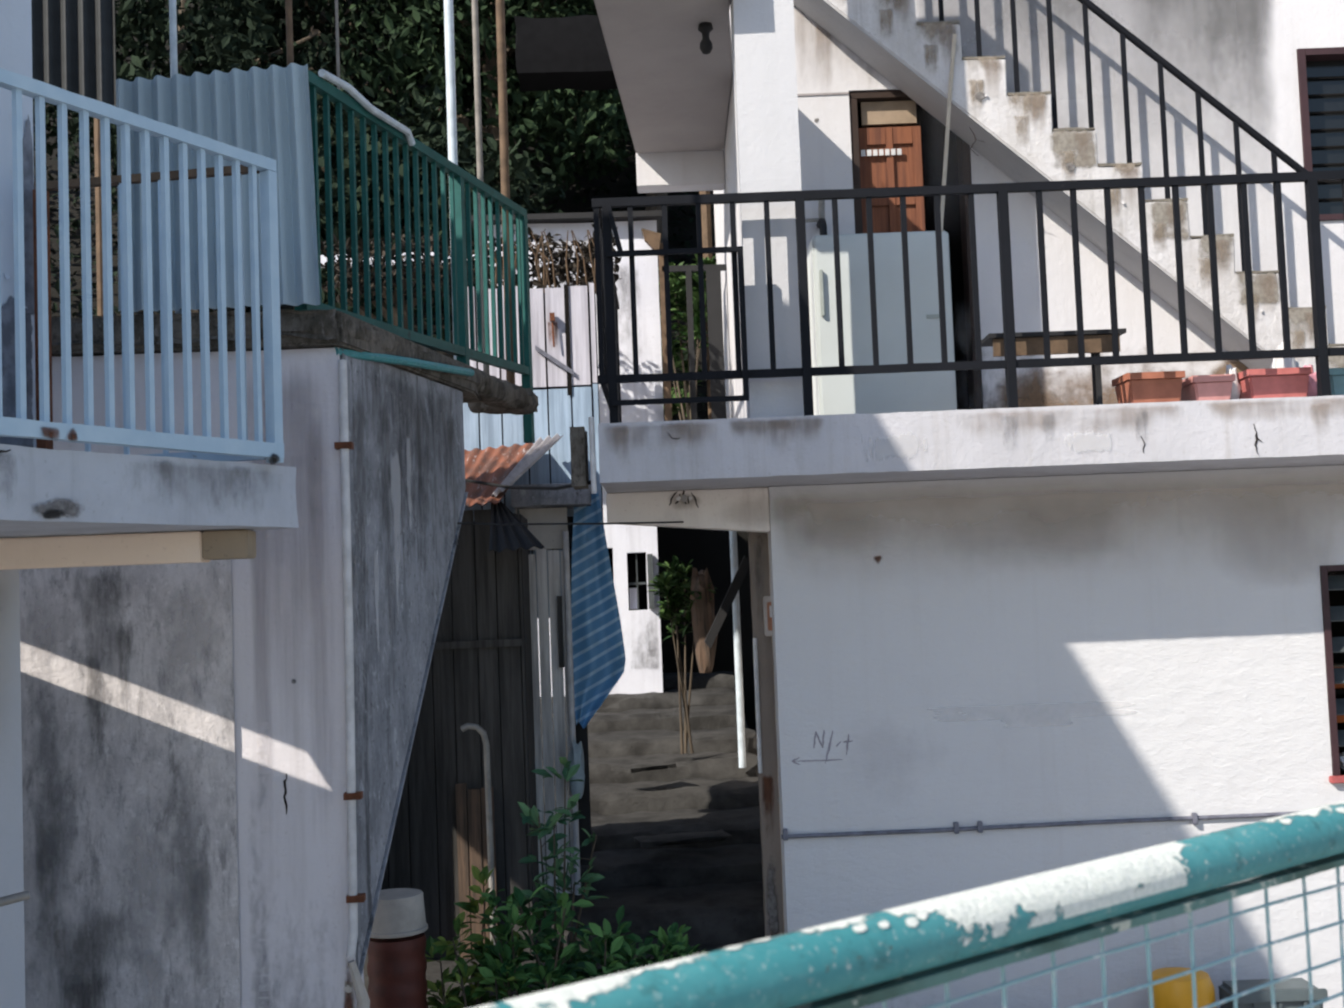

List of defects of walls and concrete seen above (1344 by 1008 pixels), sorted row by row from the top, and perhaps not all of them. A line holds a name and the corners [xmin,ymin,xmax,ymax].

leakage [923,0,1264,79]
rust [42,427,78,441]
crack [1253,424,1262,454]
spalling [35,499,80,519]
crack [281,774,289,815]
peeling [474,801,1344,1008]
peeling [344,979,353,1008]